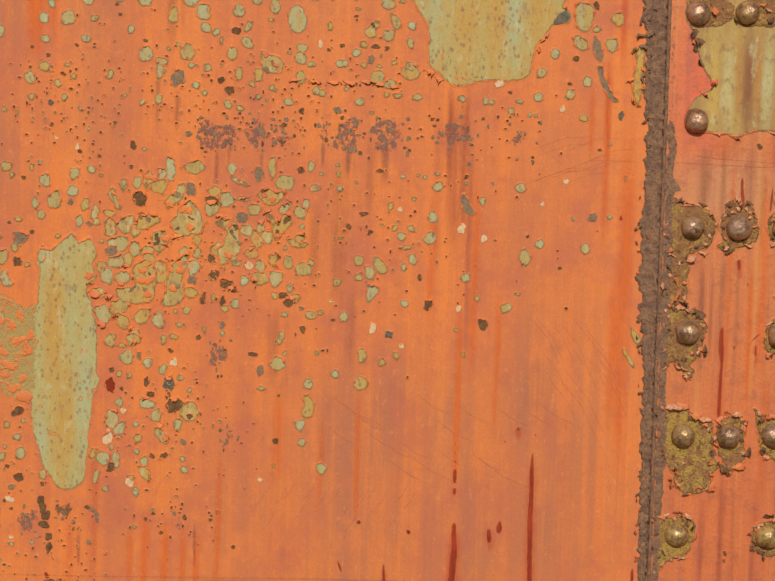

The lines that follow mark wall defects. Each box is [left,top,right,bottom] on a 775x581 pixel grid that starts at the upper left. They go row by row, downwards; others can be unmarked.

peeling [38,0,77,26]
peeling [23,33,78,106]
peeling [138,0,626,121]
peeling [627,6,656,107]
peeling [684,0,775,140]
peeling [416,171,446,192]
peeling [0,153,349,503]
peeling [353,254,389,304]
peeling [369,322,405,367]
peeling [423,298,434,312]
peeling [709,411,751,475]
corrosion [448,523,457,581]